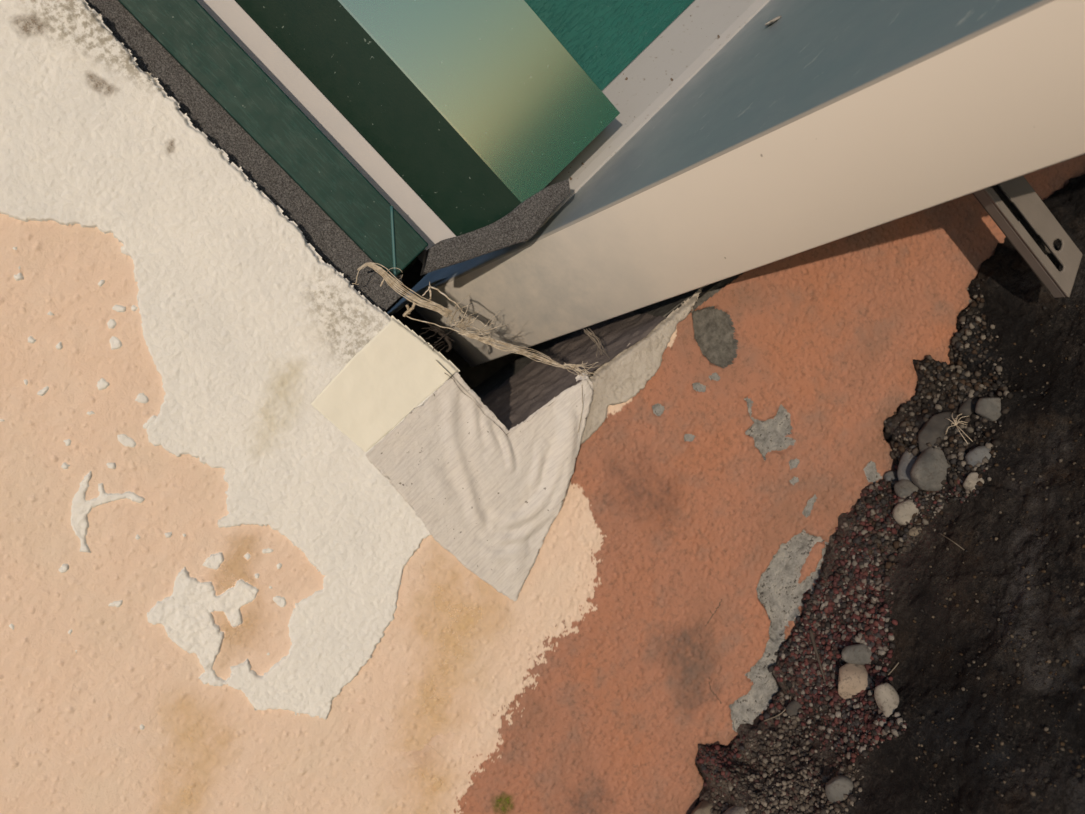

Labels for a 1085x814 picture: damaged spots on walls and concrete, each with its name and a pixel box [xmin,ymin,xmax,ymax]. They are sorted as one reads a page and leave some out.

flaking render [0,0,431,720]
flaking render [580,288,738,445]
spalling [744,397,800,486]
spalling [863,461,882,484]
spalling [729,495,829,732]